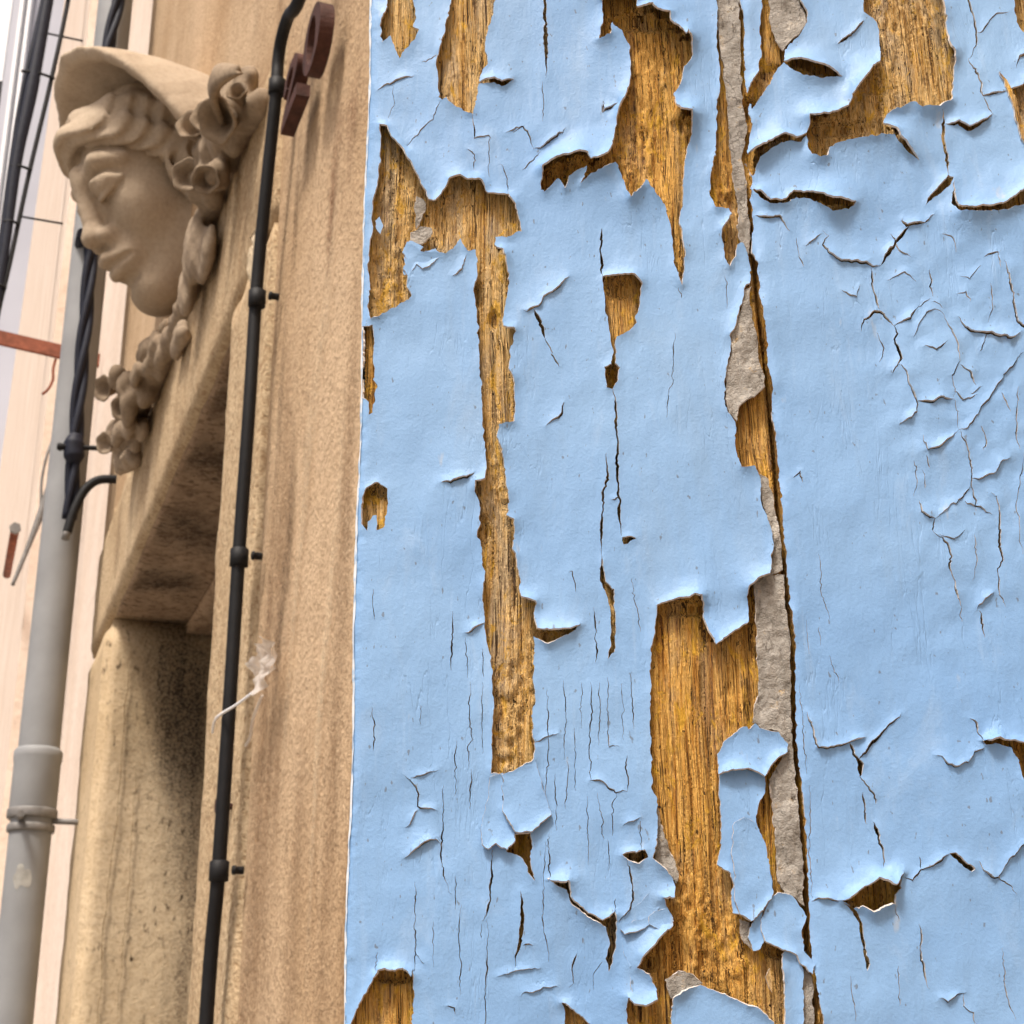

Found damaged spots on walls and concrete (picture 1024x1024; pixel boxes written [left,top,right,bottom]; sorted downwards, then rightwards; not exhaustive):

crack [597,233,605,274]
crack [754,207,792,229]
crack [600,400,621,548]
peeling [363,0,1024,1024]
crack [814,214,1022,631]
crack [592,613,600,662]
crack [403,615,493,1024]
crack [542,683,644,985]
crack [802,712,944,883]
crack [937,727,984,767]
crack [971,831,1024,885]
peeling [345,955,419,1024]